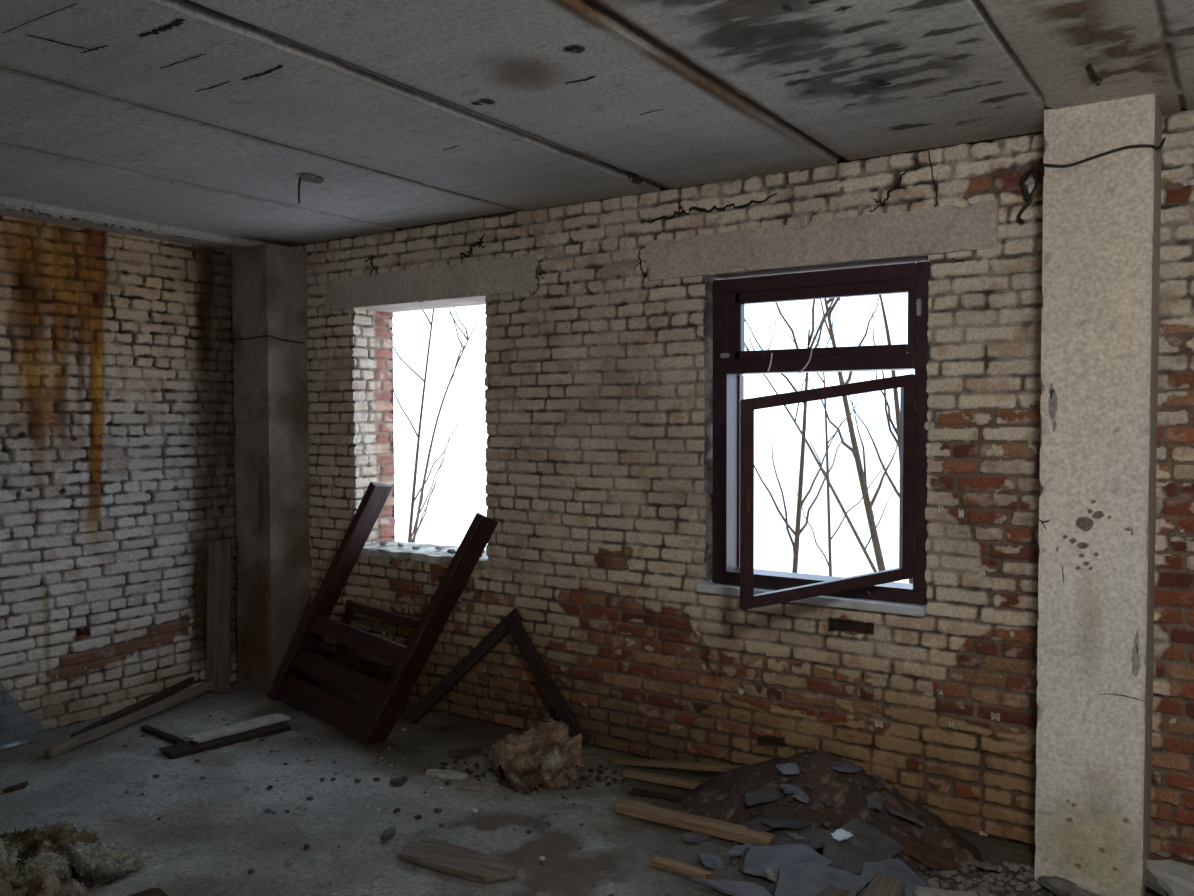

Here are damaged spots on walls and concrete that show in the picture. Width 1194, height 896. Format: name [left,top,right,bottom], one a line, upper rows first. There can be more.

leakage [650,0,978,106]
leakage [928,81,1027,108]
crack [869,149,938,212]
crack [634,193,777,278]
rust [8,222,106,519]
peeling [1160,324,1194,353]
peeling [592,546,633,573]
peeling [1151,371,1194,863]
peeling [408,573,892,760]
peeling [924,629,1038,734]
peeling [425,746,482,780]
peeling [1002,748,1035,761]